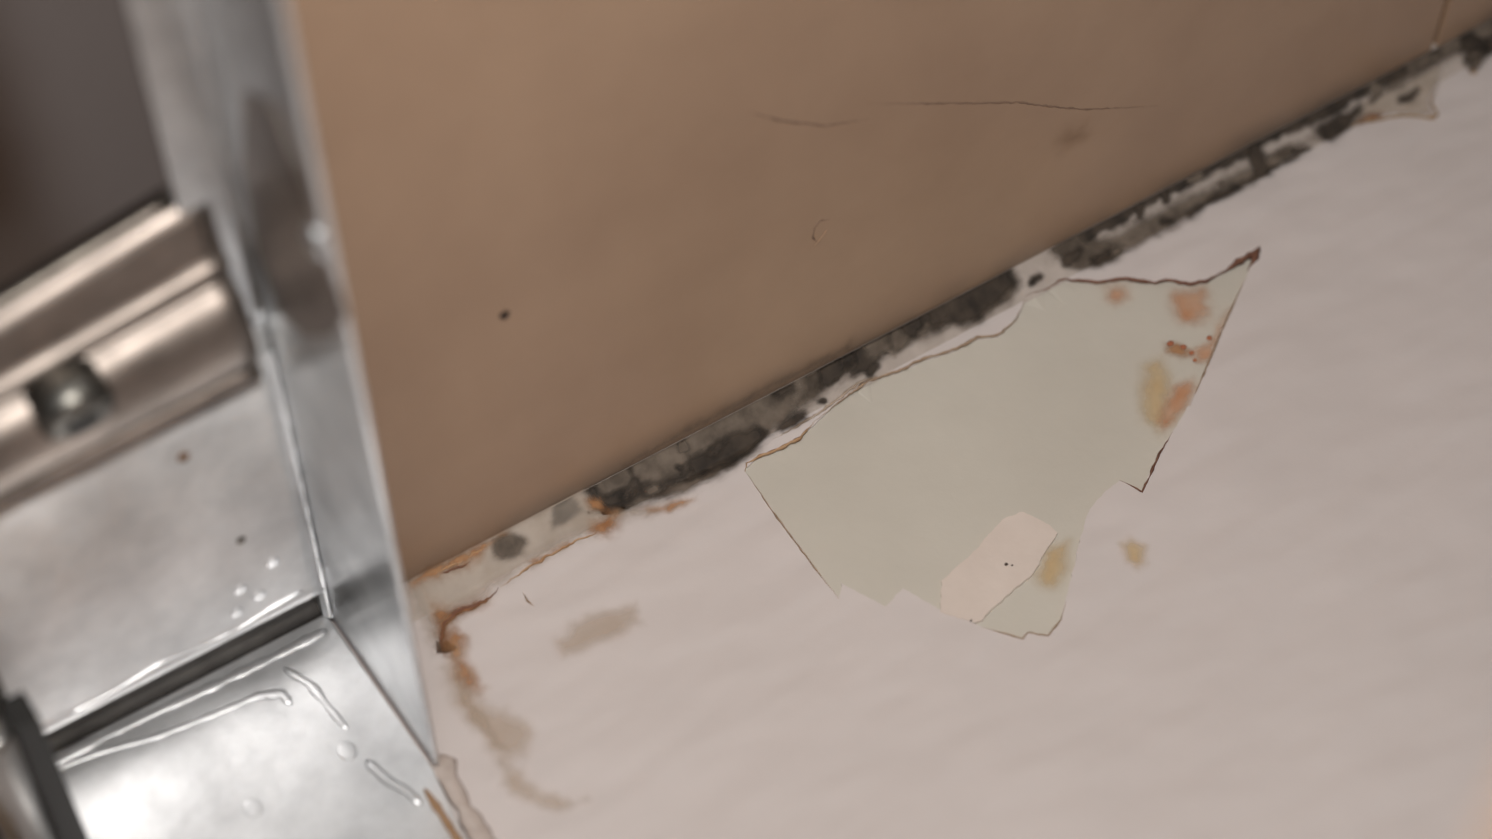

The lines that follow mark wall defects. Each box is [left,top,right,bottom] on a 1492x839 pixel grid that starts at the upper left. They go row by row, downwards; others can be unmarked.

mould [1051,19,1492,268]
mould [493,535,525,559]
peeling [409,490,636,656]
water stain [554,269,1043,524]
peeling [745,246,1261,639]